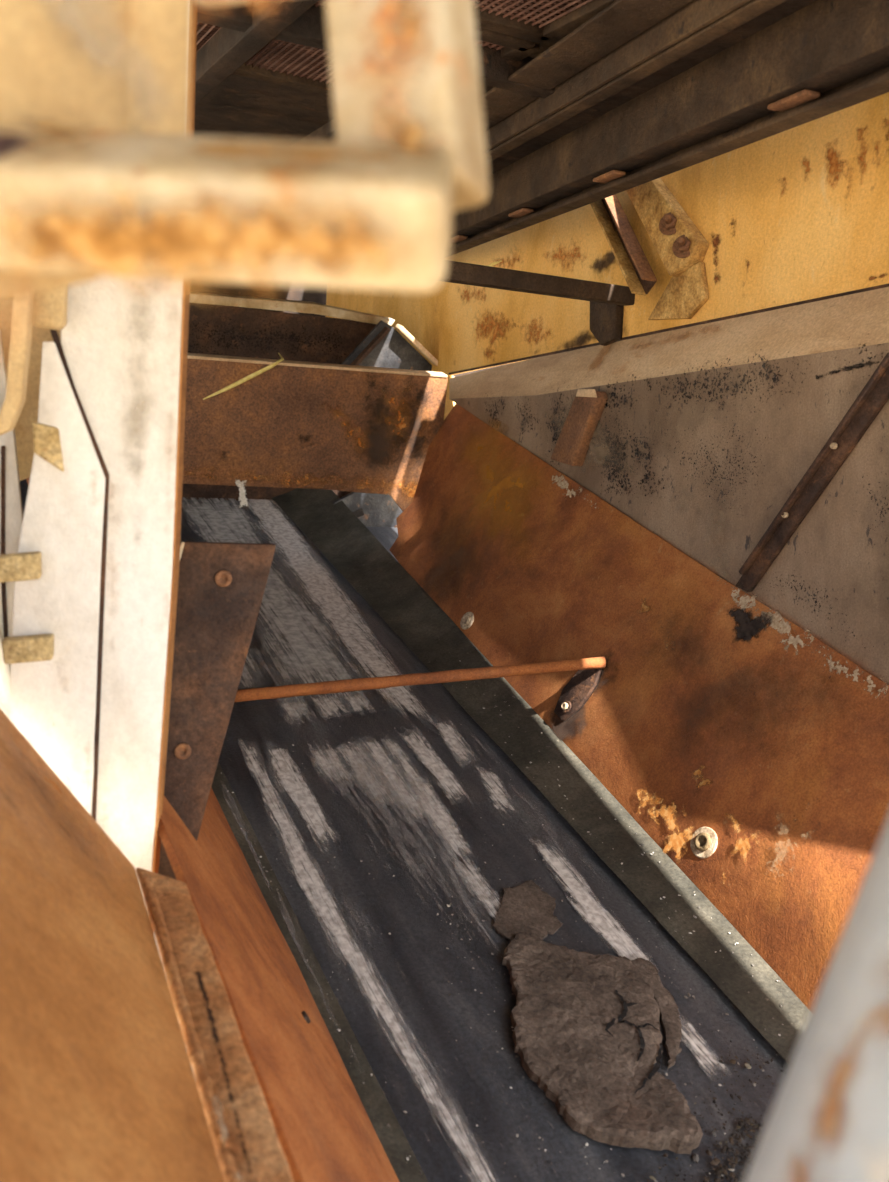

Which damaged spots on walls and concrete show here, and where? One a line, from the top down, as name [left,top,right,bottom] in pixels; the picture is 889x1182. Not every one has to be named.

corrosion [827,145,849,188]
corrosion [858,120,889,174]
corrosion [6,193,391,288]
corrosion [461,290,509,360]
spalling [717,578,888,696]
peeling [637,790,696,858]
peeling [730,816,757,858]
corrosion [816,1048,854,1140]